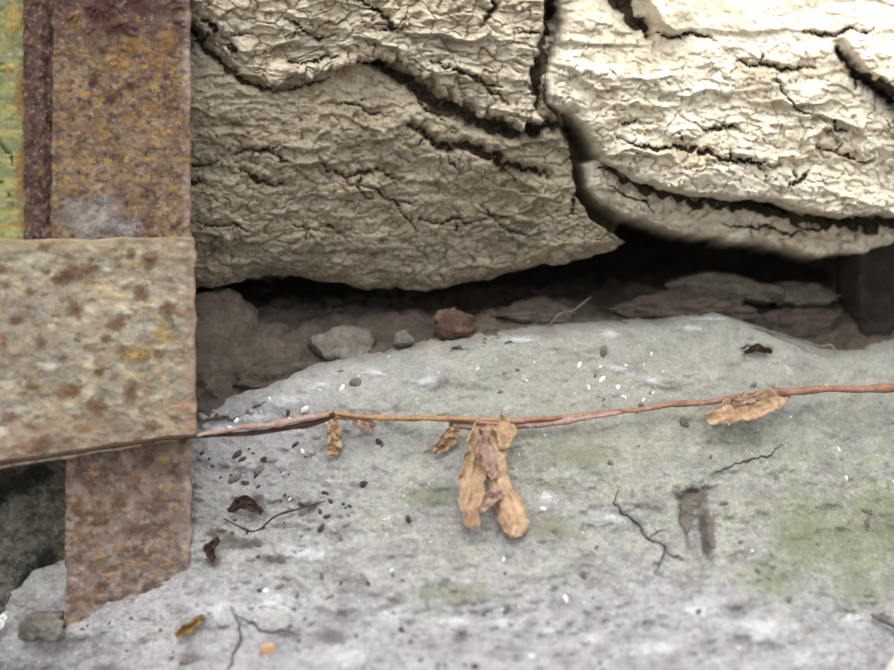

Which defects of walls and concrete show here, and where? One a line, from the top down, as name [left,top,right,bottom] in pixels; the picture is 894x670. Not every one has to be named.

rust [21,0,54,251]
rust [127,250,156,268]
rust [52,264,98,283]
rust [134,286,148,301]
rust [67,300,82,317]
rust [101,316,124,342]
rust [119,301,175,361]
rust [123,383,136,402]
rust [23,435,52,452]
crack [711,445,781,475]
crack [613,489,683,572]